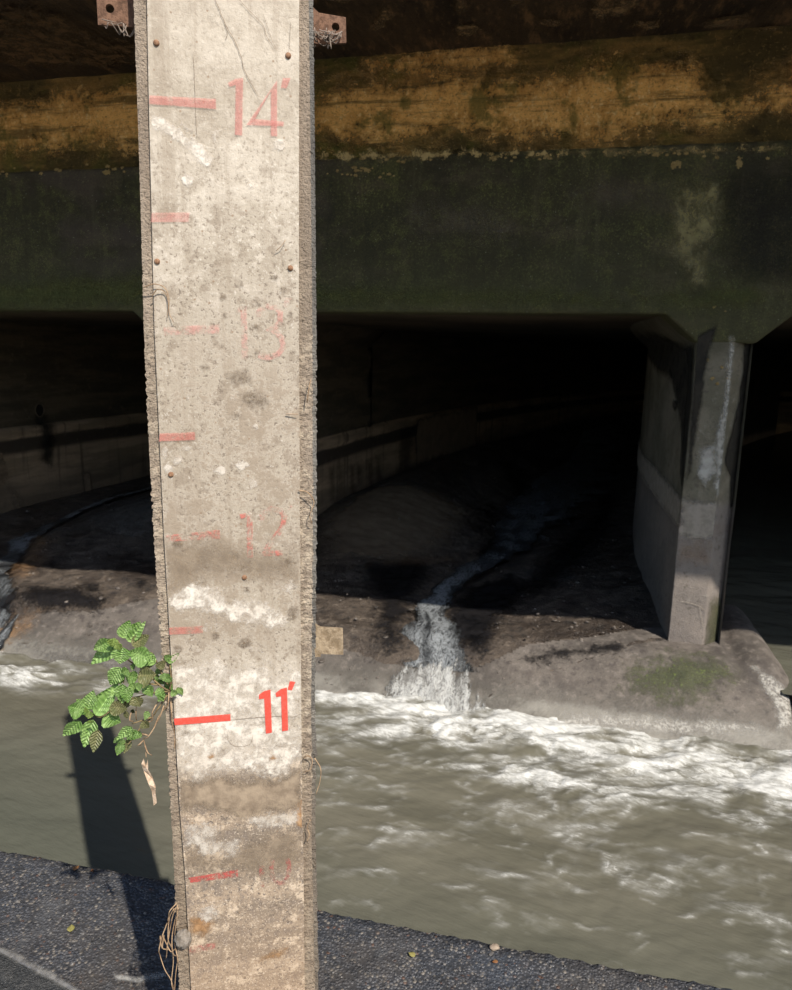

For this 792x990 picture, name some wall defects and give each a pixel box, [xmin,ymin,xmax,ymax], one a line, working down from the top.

crack [215,0,291,96]
water stain [672,182,719,283]
water stain [637,328,751,539]